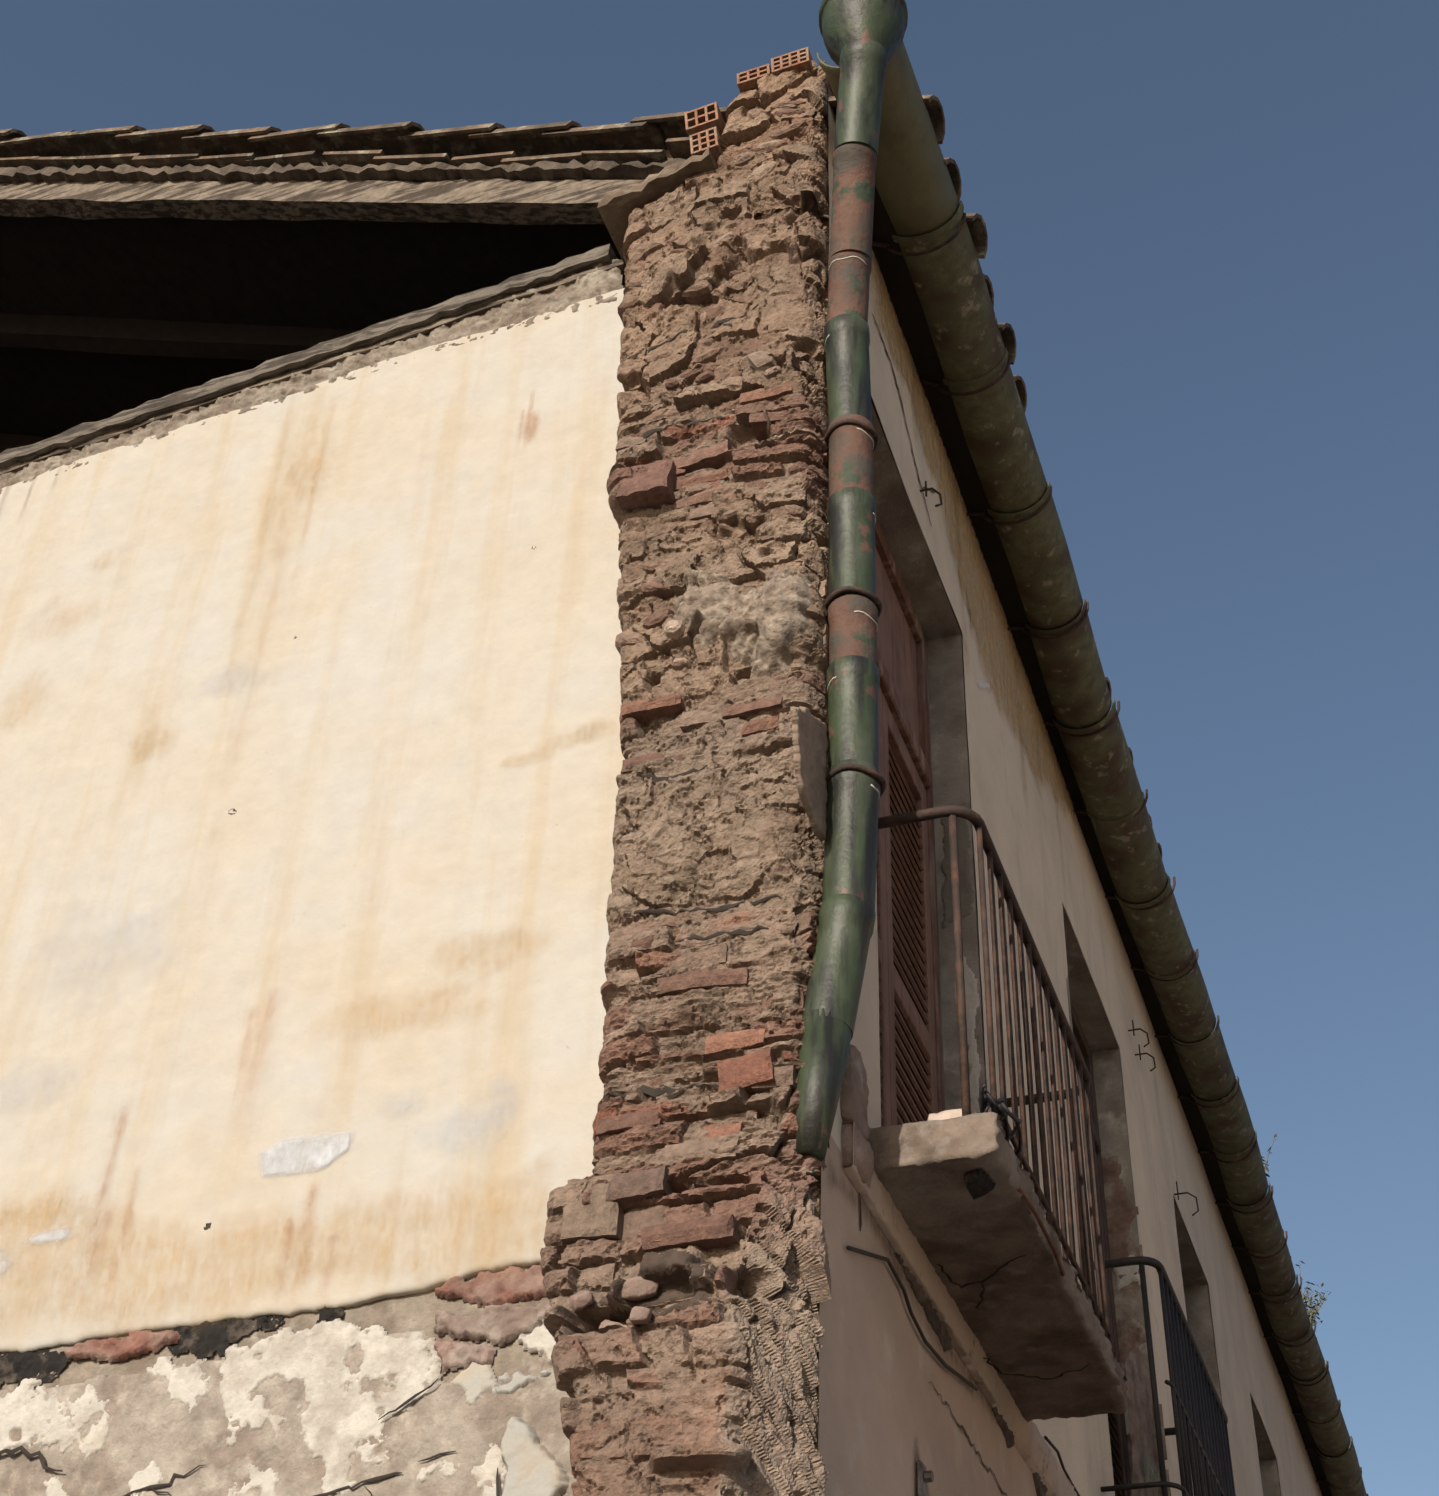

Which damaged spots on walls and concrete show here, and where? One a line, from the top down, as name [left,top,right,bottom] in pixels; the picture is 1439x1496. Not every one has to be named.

peeling [263,1133,350,1175]
flaking render [1101,1156,1171,1496]
crack [0,1445,63,1472]
peeling [0,1378,110,1460]
peeling [43,1477,67,1496]
crack [124,1465,204,1496]
peeling [64,1265,556,1496]
crack [929,1381,1007,1496]